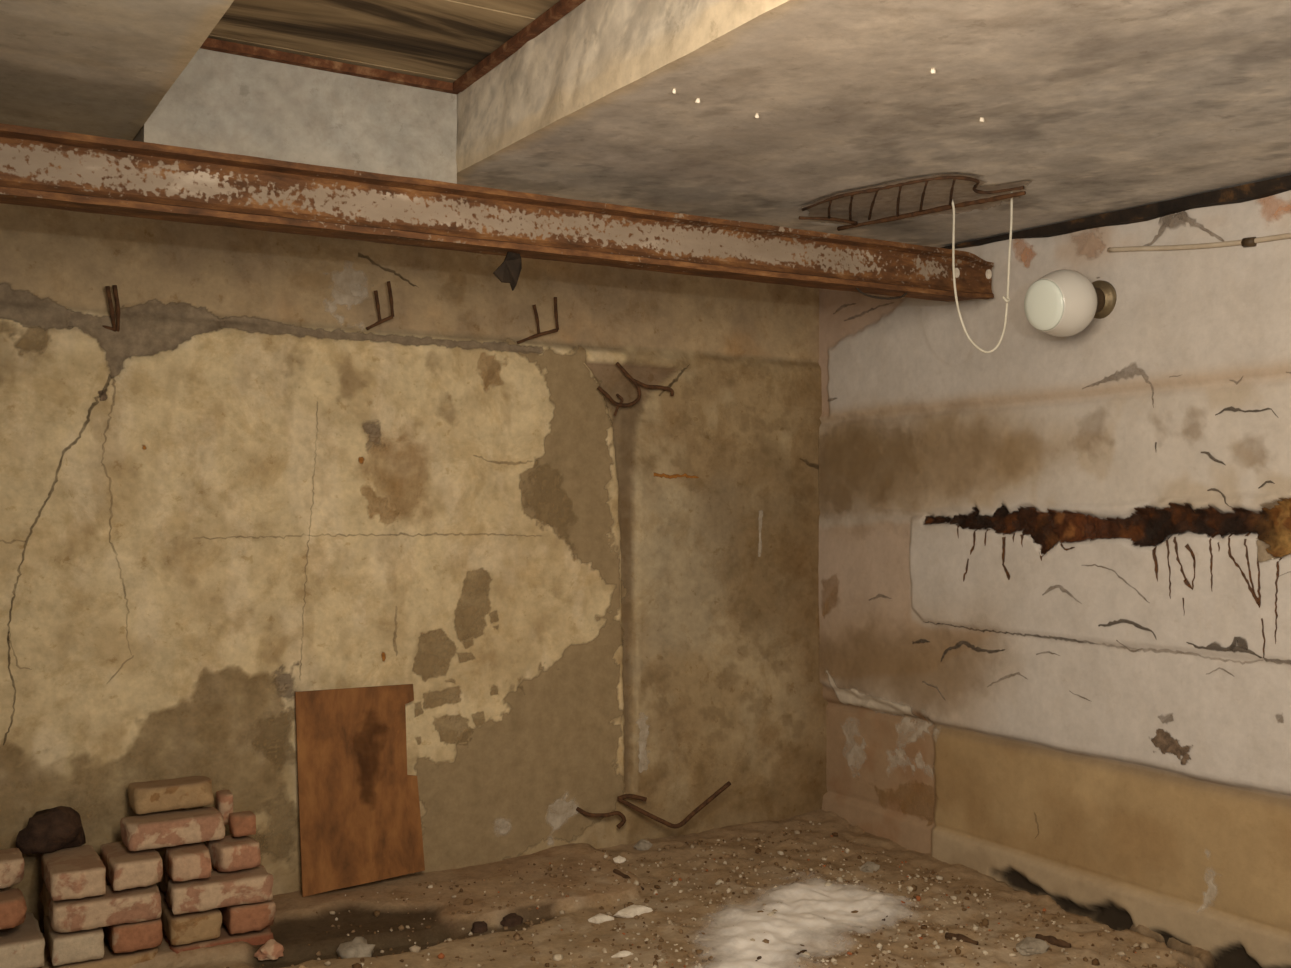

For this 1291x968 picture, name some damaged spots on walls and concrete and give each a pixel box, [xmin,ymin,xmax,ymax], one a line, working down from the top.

spalling [799,173,1031,231]
peeling [1147,211,1225,246]
crack [31,379,110,528]
crack [4,559,24,742]
flaking render [0,281,731,874]
crack [925,622,1082,643]
corrosion [924,498,1291,658]
crack [1263,657,1291,665]